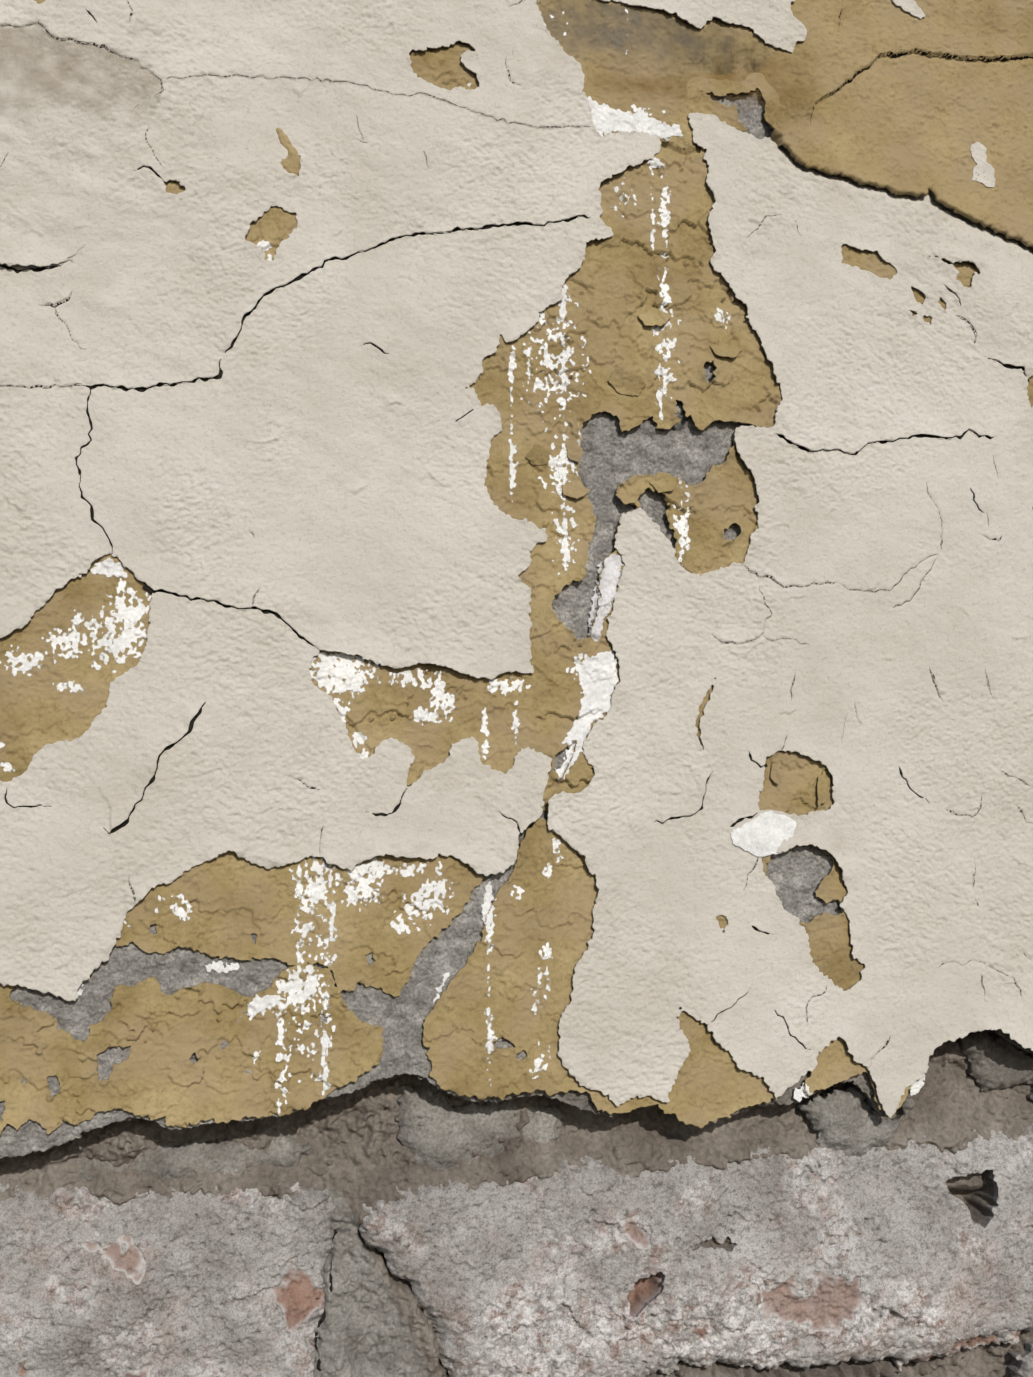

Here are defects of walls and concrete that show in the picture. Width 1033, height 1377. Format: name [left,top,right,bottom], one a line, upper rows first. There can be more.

crack [2,0,592,178]
crack [811,49,1033,117]
peeling [245,206,297,261]
crack [0,215,588,549]
peeling [309,0,1033,816]
crack [778,429,1002,541]
peeling [0,554,152,782]
crack [142,583,320,651]
crack [105,702,206,834]
peeling [0,817,777,1159]
peeling [762,844,865,991]
peeling [793,1037,925,1119]